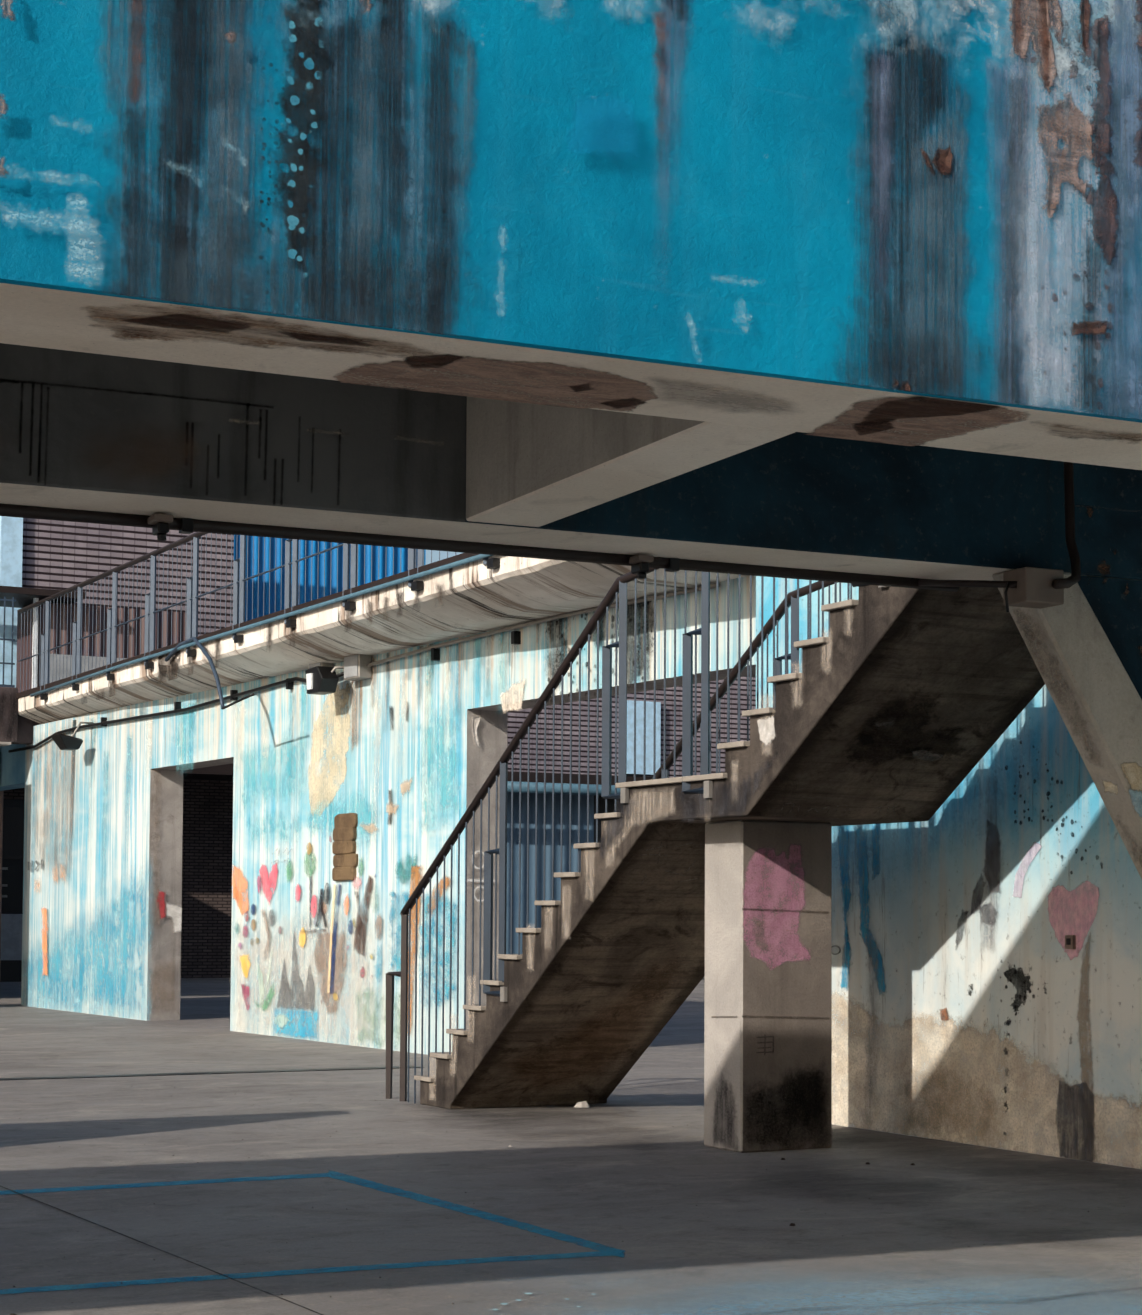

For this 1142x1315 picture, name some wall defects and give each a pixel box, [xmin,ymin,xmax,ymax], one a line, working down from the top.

damp [107,0,473,334]
damp [848,33,968,396]
peeling [995,0,1119,409]
peeling [1133,98,1142,166]
peeling [1134,0,1142,61]
damp [714,1071,828,1150]